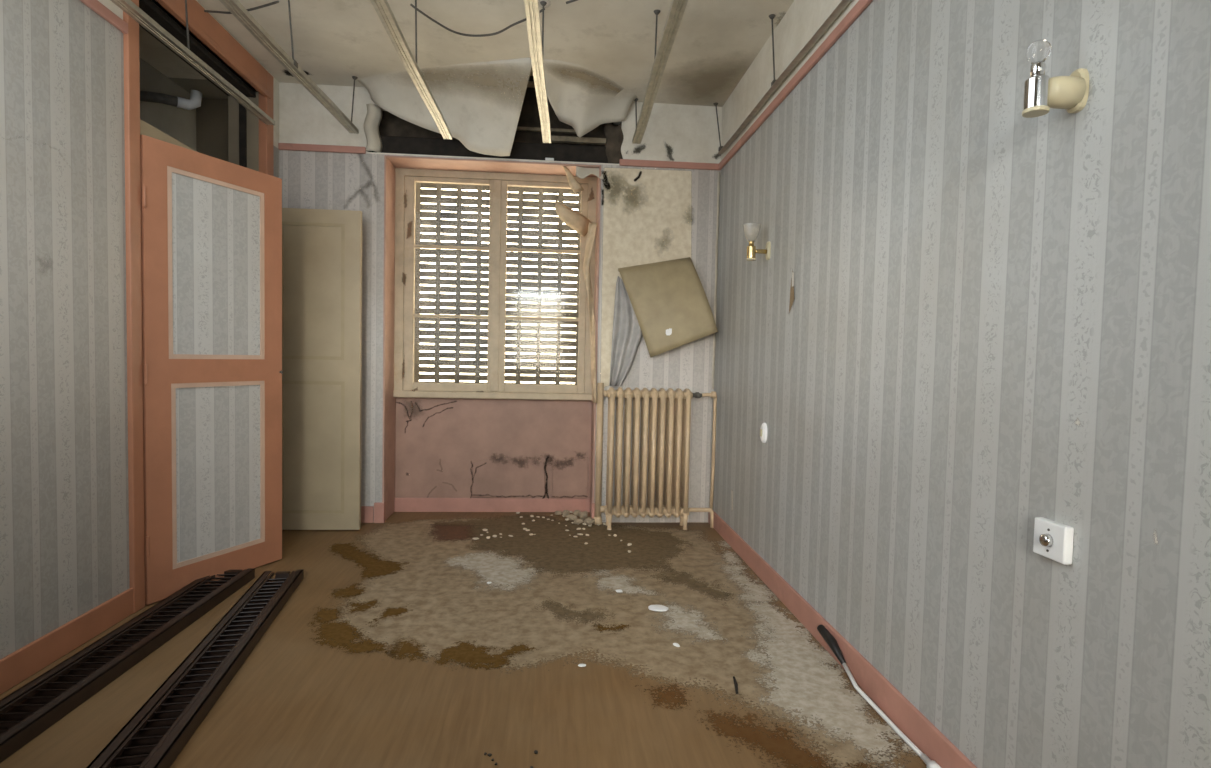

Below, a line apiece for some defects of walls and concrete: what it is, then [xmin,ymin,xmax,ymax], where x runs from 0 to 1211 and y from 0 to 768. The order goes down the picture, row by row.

spalling [364,103,382,153]
water stain [601,170,637,206]
crack [396,401,457,433]
crack [470,456,587,499]